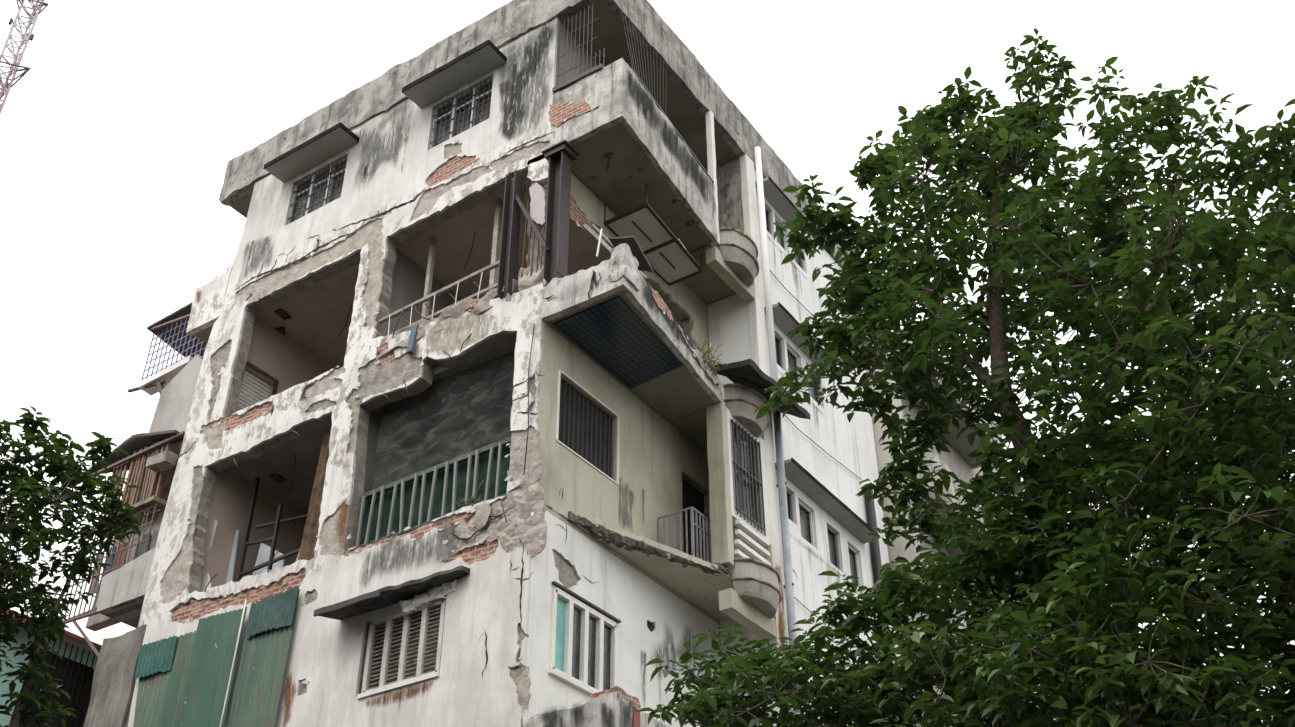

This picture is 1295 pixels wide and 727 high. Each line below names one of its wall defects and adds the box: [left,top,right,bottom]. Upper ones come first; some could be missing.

damp [500,26,554,138]
flaking render [411,139,550,221]
flaking render [237,219,385,328]
flaking render [198,340,273,468]
flaking render [316,374,579,590]
flaking render [161,466,318,624]
crack [444,507,533,624]
spalling [568,511,729,576]
corrosion [283,675,295,726]
crack [480,632,488,678]
damp [542,705,582,727]
damp [602,703,631,727]